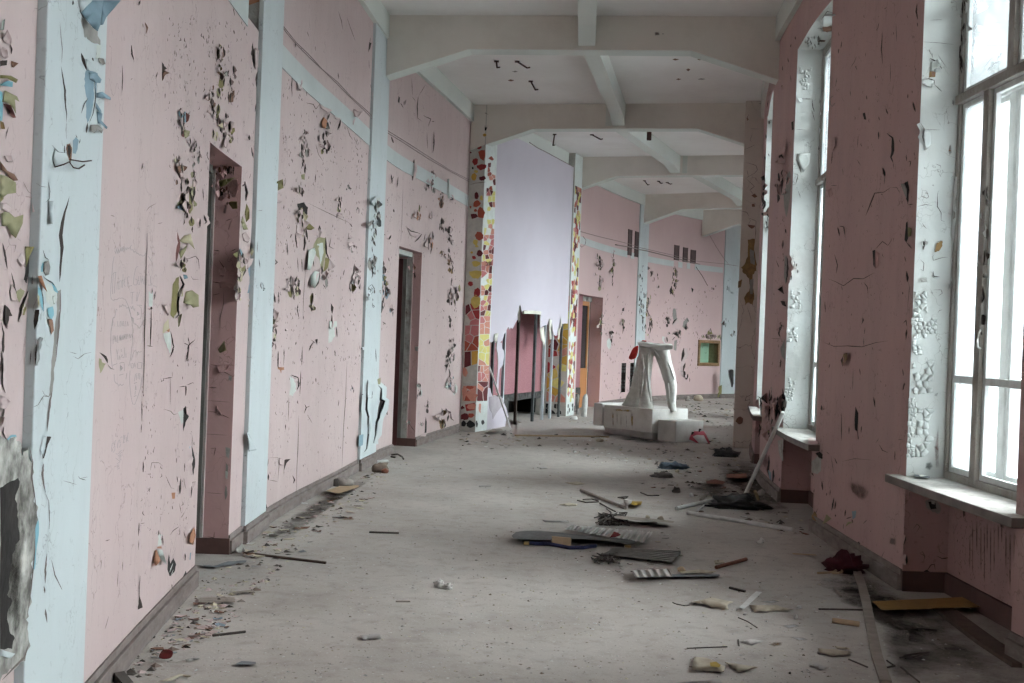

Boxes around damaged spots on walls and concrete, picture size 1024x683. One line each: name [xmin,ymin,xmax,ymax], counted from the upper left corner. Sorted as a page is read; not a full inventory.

peeling [0,19,19,136]
peeling [72,0,121,133]
spalling [0,155,58,681]
peeling [163,108,202,356]
peeling [211,166,254,307]
peeling [272,104,335,350]
peeling [359,378,390,454]
spalling [621,363,634,392]
peeling [637,265,690,382]
peeling [768,121,801,309]
crack [794,4,945,565]
peeling [906,291,949,457]